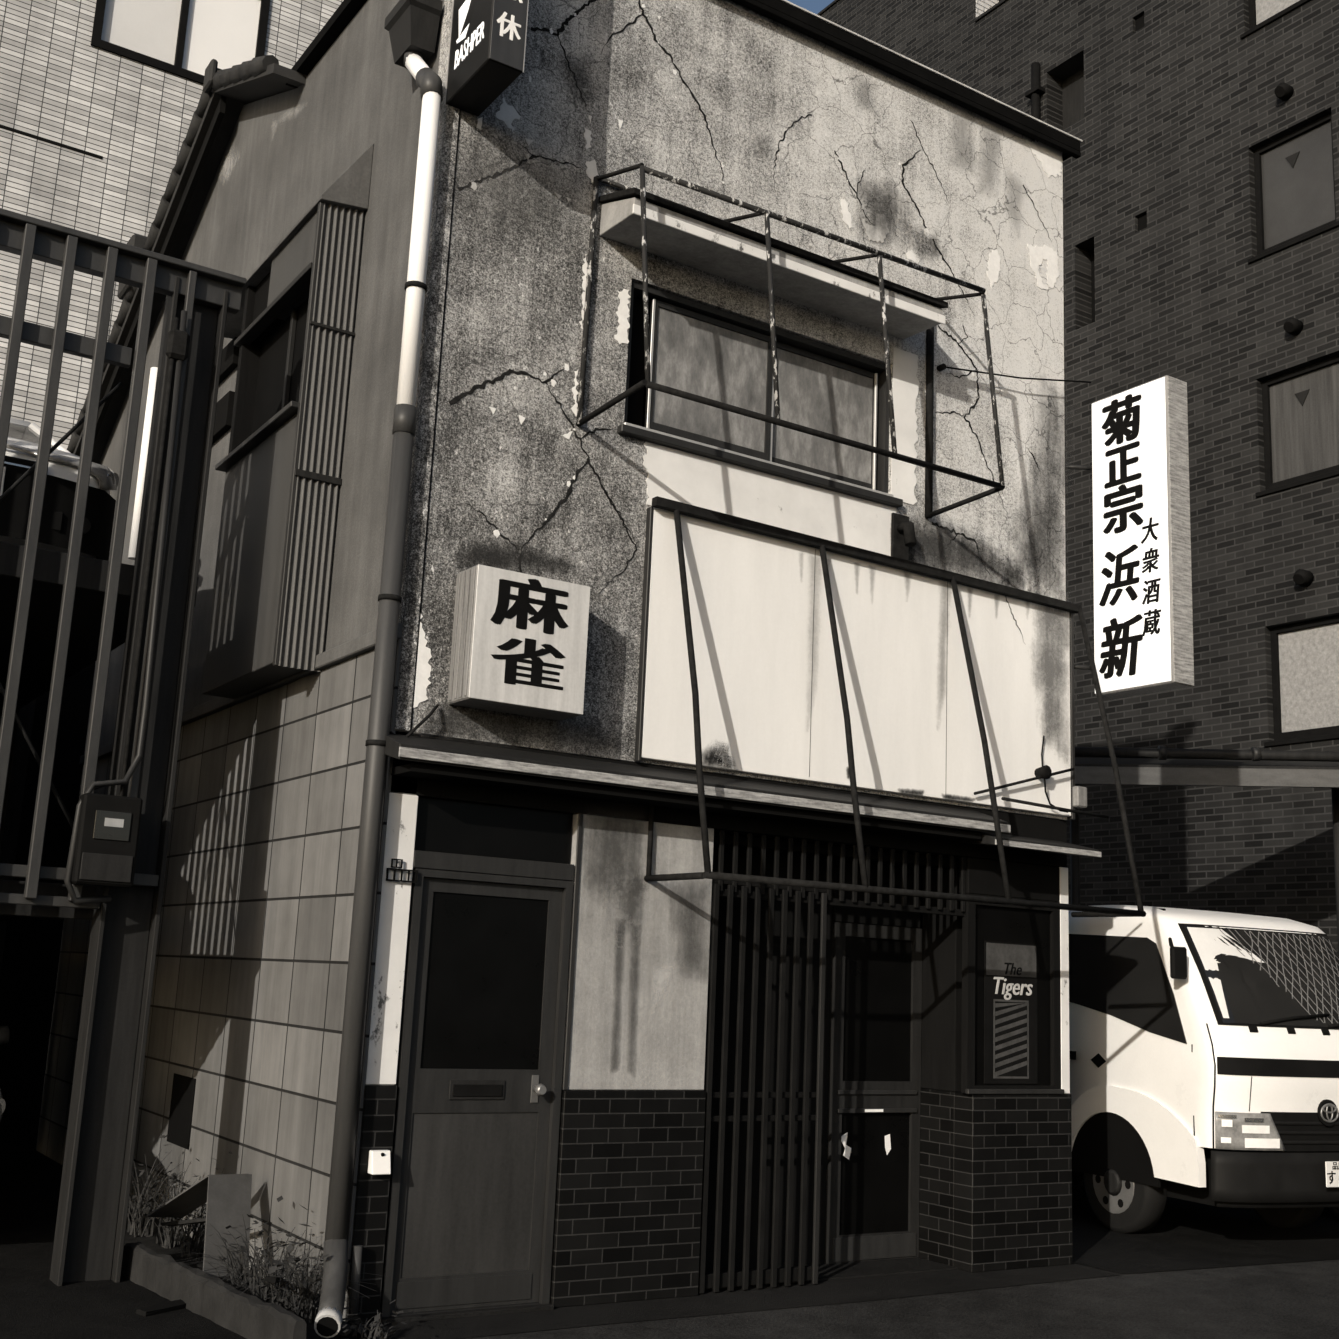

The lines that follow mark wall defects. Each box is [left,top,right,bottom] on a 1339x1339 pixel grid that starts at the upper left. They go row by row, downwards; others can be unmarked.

peeling [476,98,533,146]
peeling [584,115,599,183]
crack [602,0,725,190]
crack [773,114,812,190]
crack [834,151,871,223]
peeling [839,196,889,243]
leakage [867,190,937,255]
peeling [906,250,920,264]
peeling [986,249,1001,289]
crack [899,120,1008,517]
crack [449,363,637,594]
leakage [594,807,642,1068]